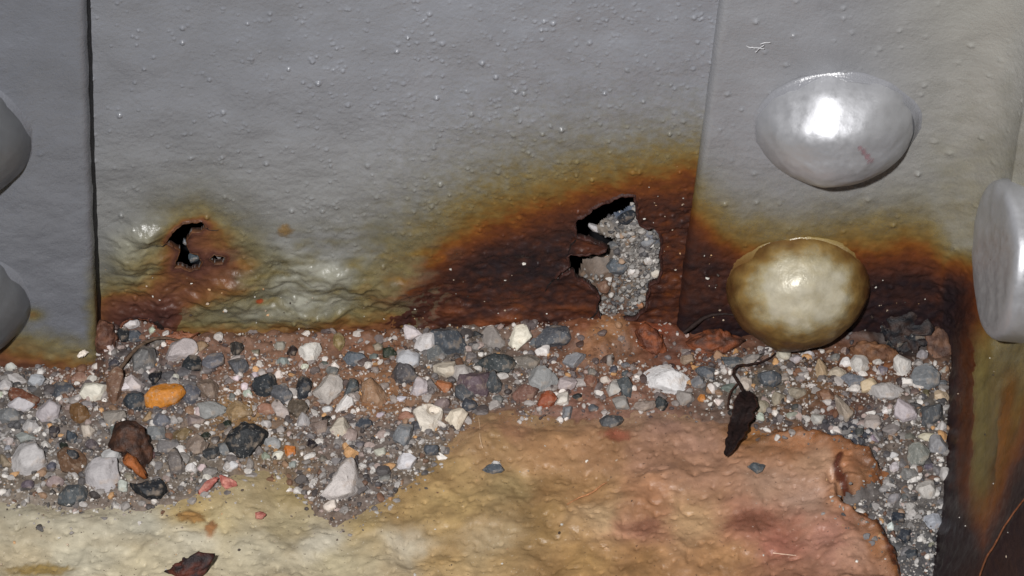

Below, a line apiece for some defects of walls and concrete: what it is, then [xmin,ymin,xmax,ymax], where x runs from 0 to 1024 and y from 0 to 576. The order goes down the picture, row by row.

corrosion [0,133,1024,576]